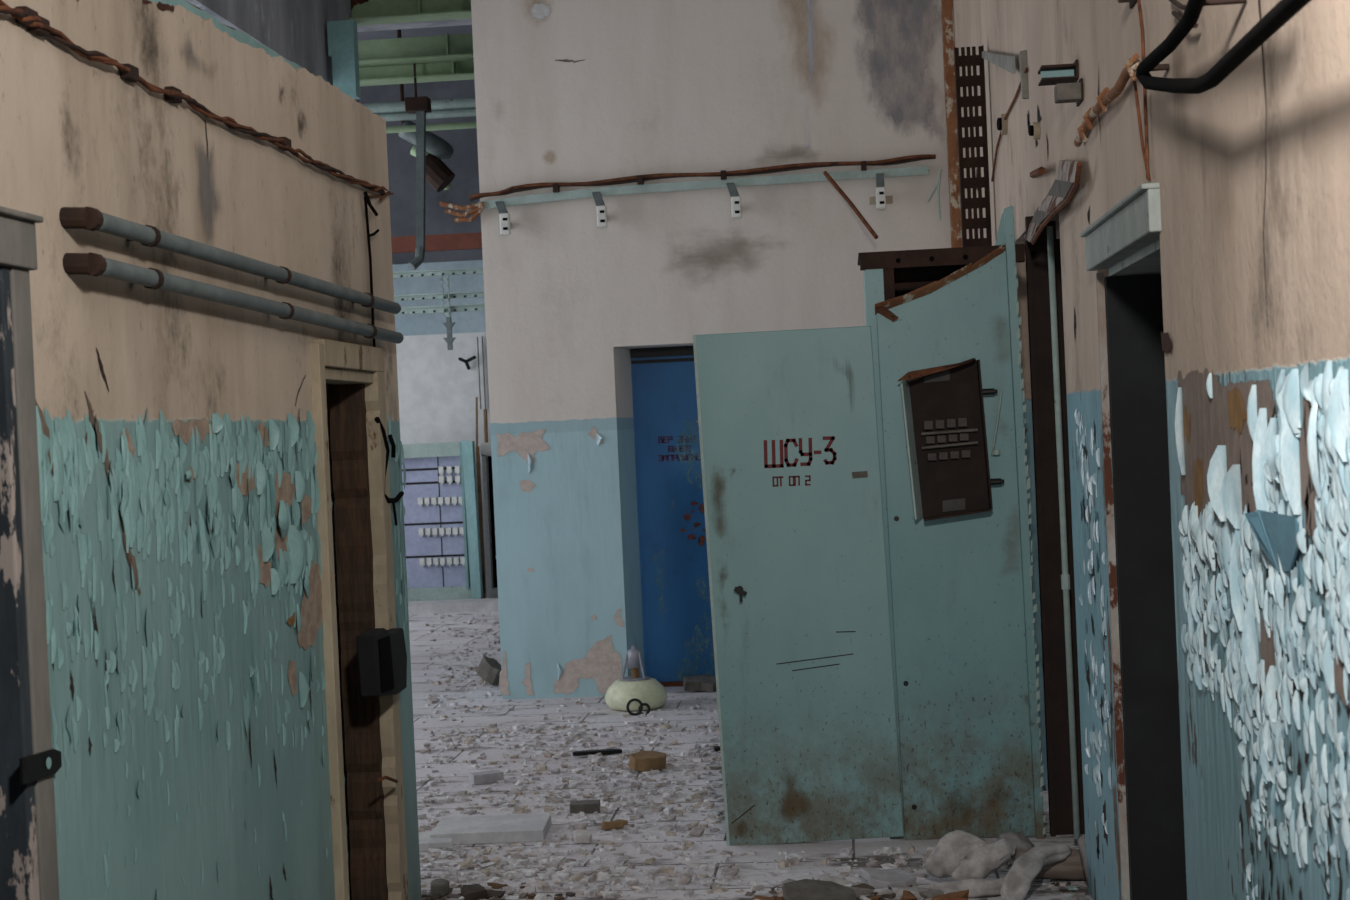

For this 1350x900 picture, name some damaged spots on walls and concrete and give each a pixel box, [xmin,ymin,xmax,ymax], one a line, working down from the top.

water stain [862,0,936,130]
peeling [36,406,326,823]
peeling [388,414,409,641]
peeling [499,651,534,696]
peeling [496,429,550,492]
peeling [553,609,624,695]
peeling [1074,409,1112,857]
peeling [1175,360,1350,900]